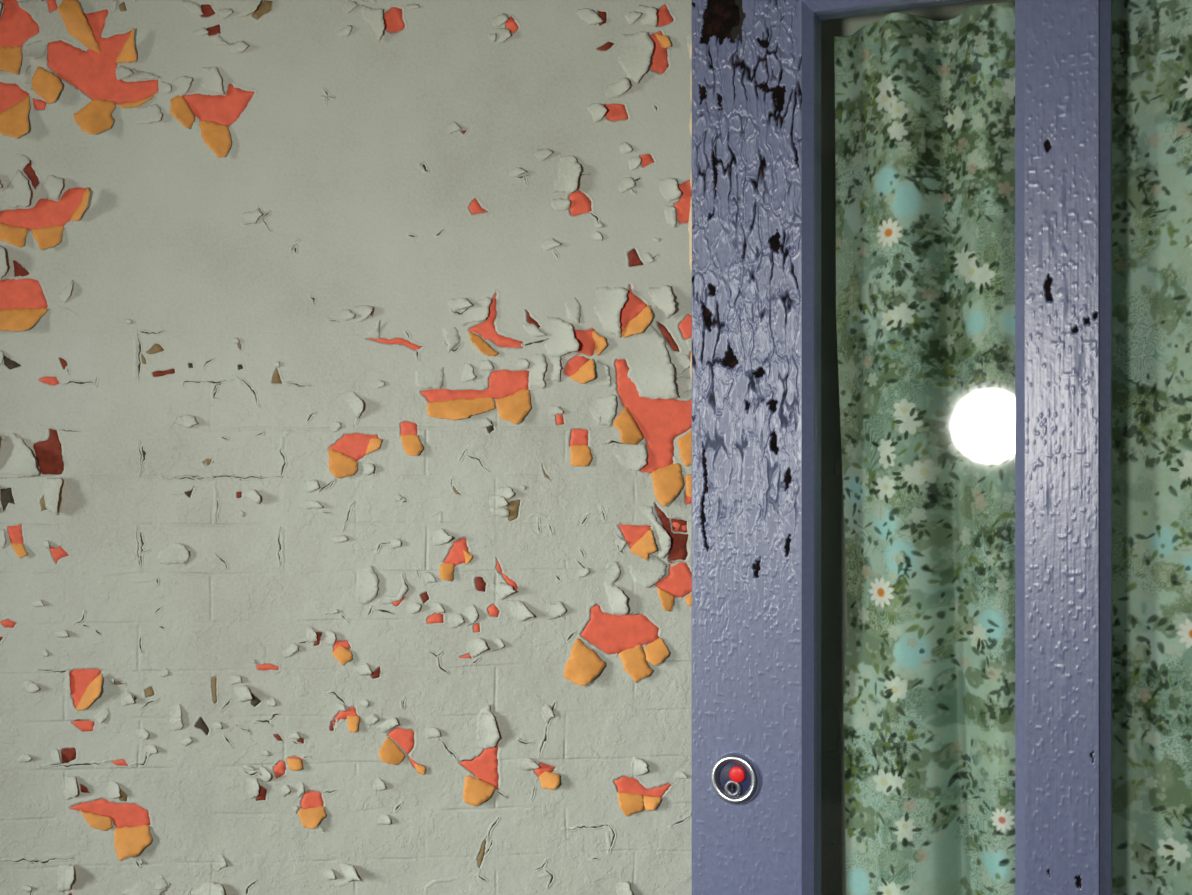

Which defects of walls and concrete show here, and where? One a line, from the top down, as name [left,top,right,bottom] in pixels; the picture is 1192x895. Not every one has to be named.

peeling [0,0,259,158]
peeling [0,154,94,332]
peeling [534,148,604,241]
peeling [659,168,692,274]
peeling [0,425,82,558]
peeling [303,390,383,543]
peeling [326,237,692,686]
crack [692,0,805,895]
crack [1024,0,1099,895]
peeling [16,649,339,895]
peeling [322,690,560,806]
peeling [609,756,692,816]